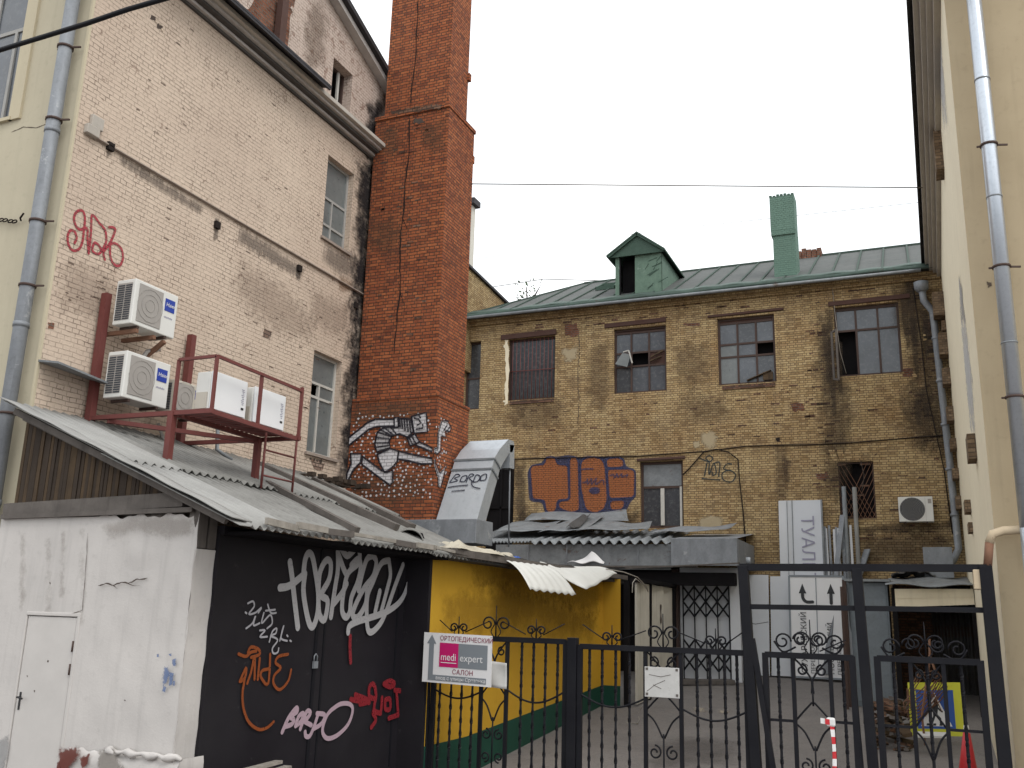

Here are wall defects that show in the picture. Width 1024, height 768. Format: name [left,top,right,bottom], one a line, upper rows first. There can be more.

crack [394,1,418,351]
leakage [241,234,301,278]
crack [74,536,146,613]
peeling [57,747,124,768]